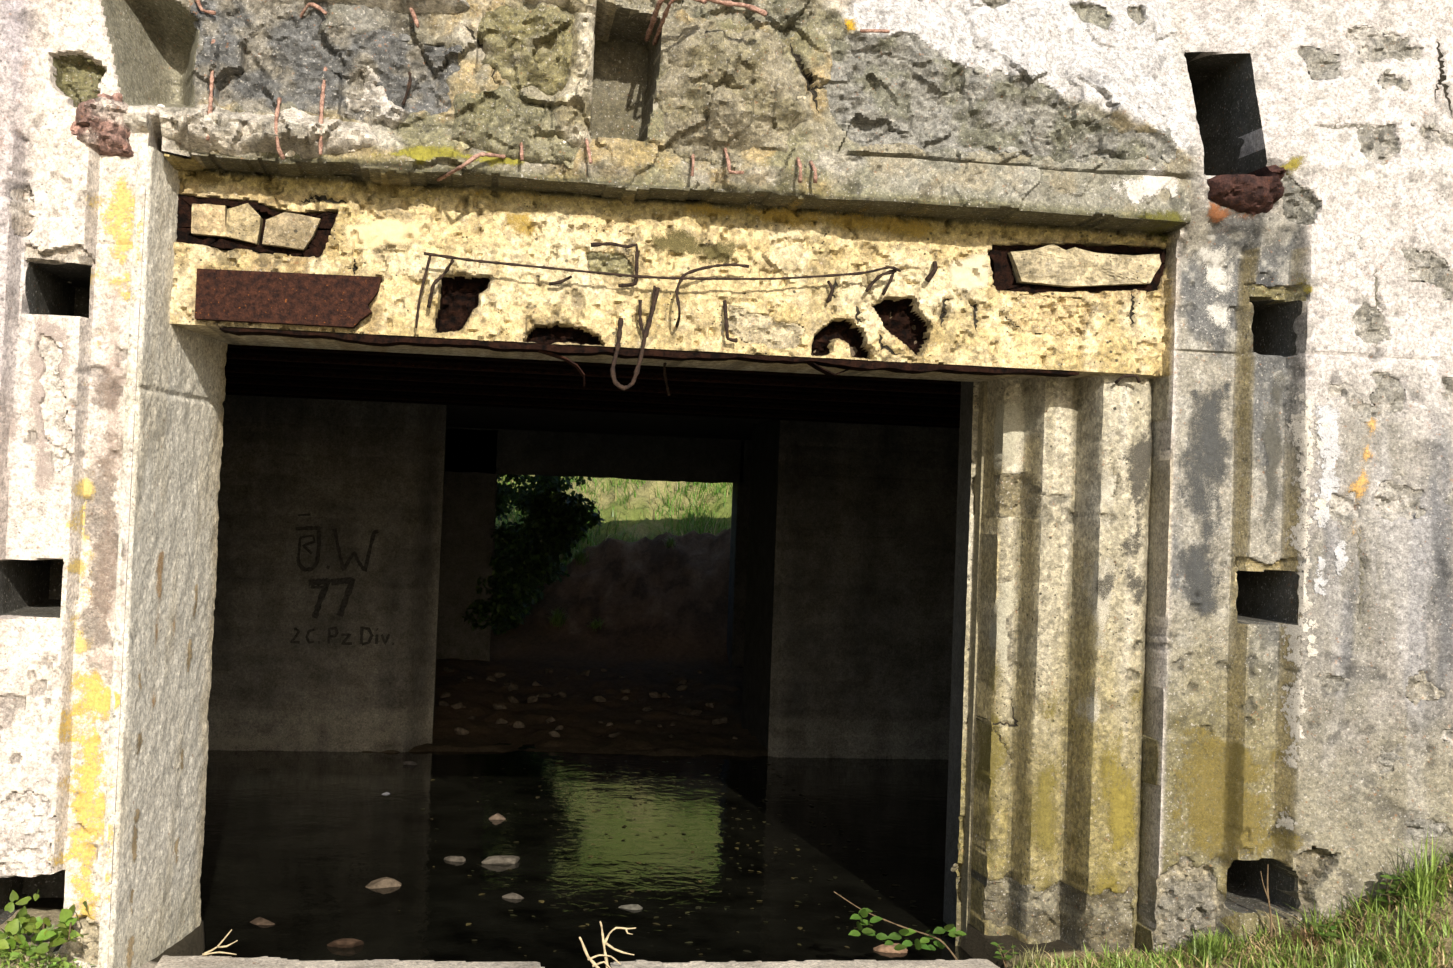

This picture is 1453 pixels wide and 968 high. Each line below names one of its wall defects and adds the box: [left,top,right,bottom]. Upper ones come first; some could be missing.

spalling [615,0,815,46]
spalling [982,0,1007,9]
spalling [1070,3,1147,30]
corrosion [70,93,134,158]
spalling [190,0,465,160]
spalling [823,29,1177,163]
spalling [437,142,524,182]
spalling [723,148,744,174]
corrosion [1202,165,1286,234]
leakage [983,359,1303,833]